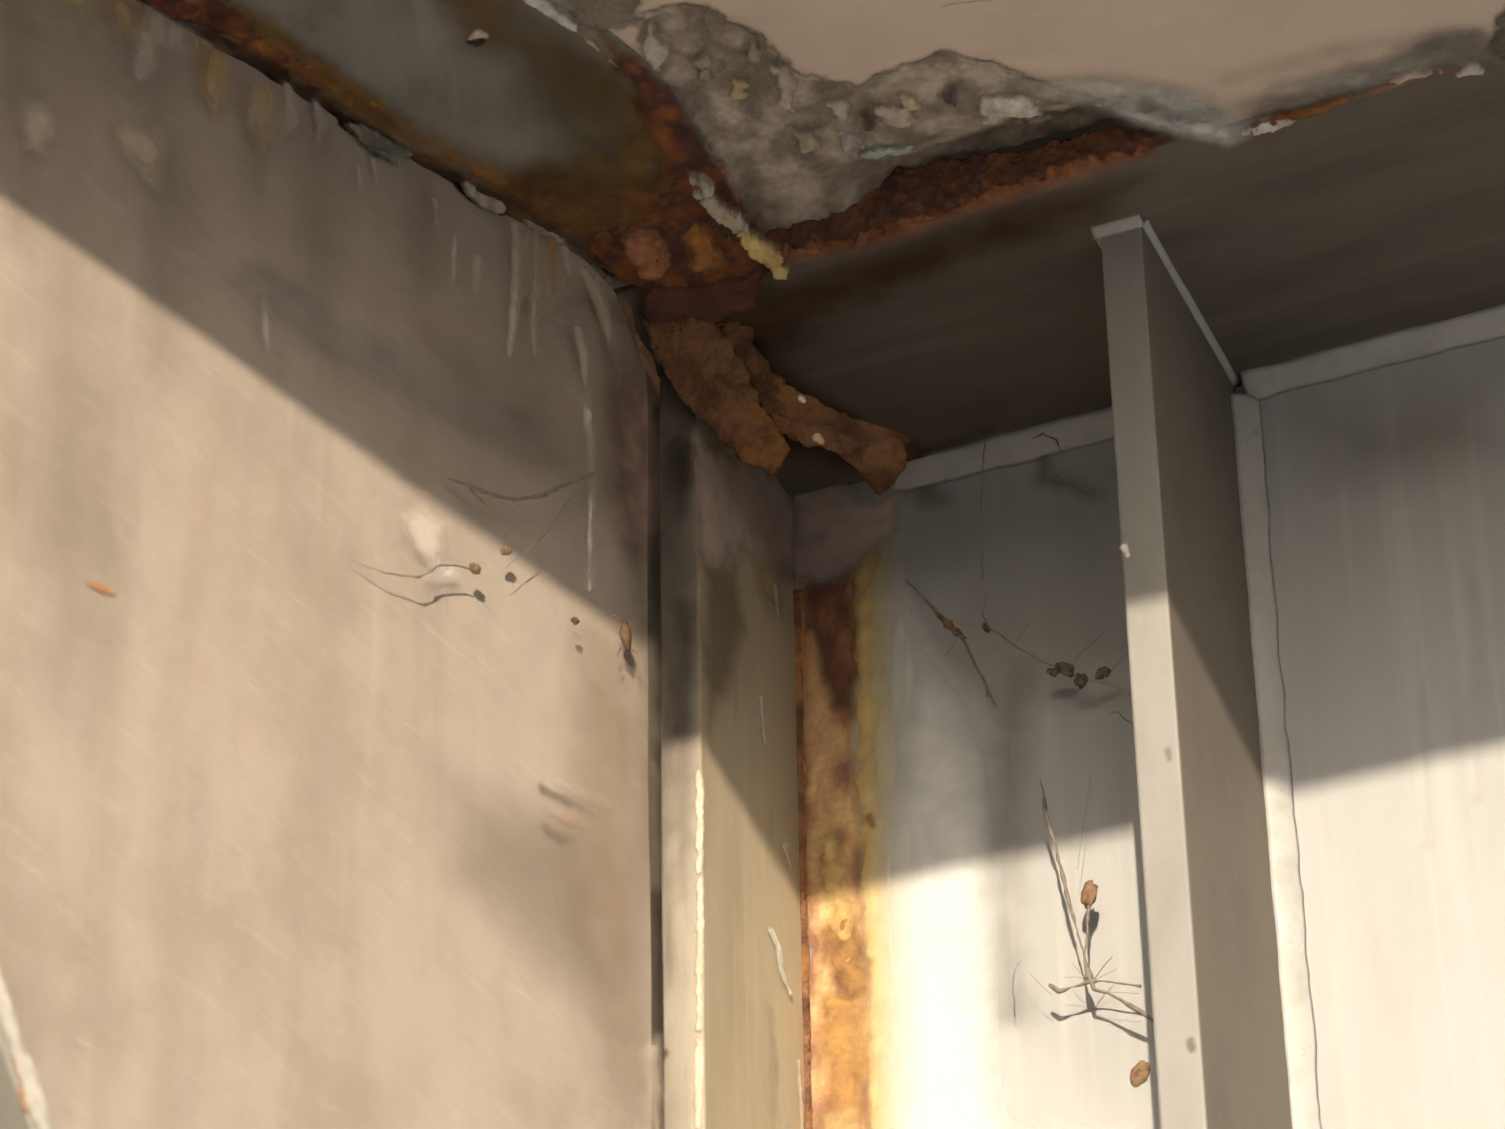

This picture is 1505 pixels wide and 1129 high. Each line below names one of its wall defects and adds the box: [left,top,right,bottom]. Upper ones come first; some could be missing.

peeling [466,30,488,46]
spalling [1483,14,1505,57]
spalling [555,0,1223,241]
spalling [463,179,506,214]
spalling [523,219,566,244]
corrosion [145,0,910,1129]